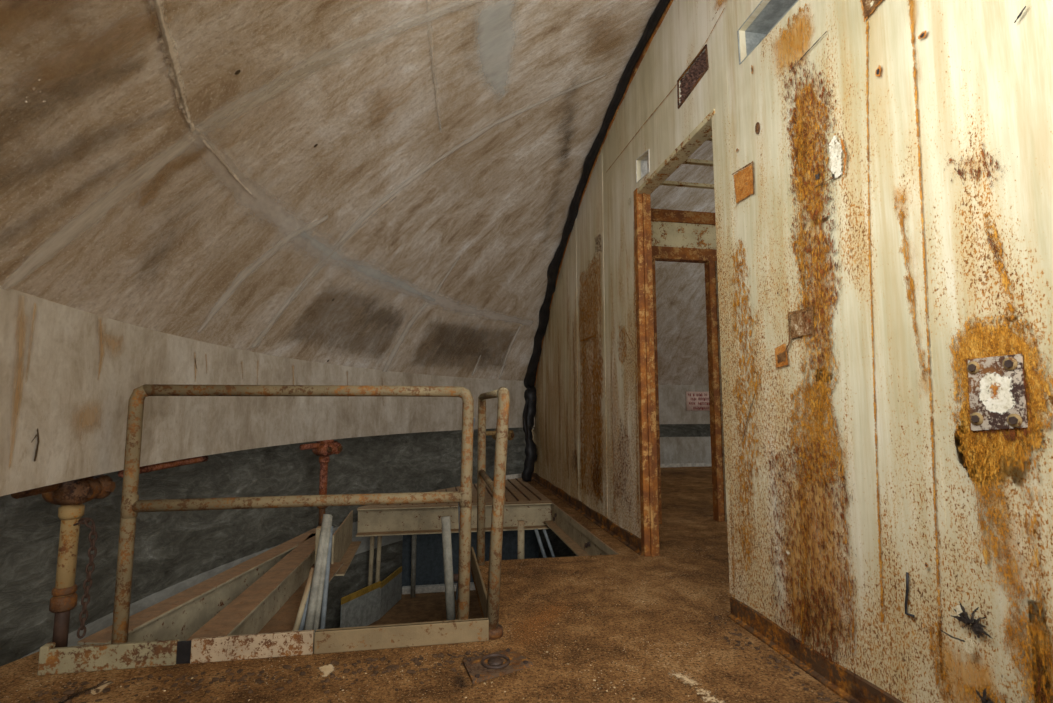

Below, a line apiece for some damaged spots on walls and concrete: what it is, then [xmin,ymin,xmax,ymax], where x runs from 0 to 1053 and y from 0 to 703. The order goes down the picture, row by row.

water stain [5,0,606,378]
corrosion [545,222,639,522]
corrosion [729,4,857,666]
corrosion [866,20,884,622]
corrosion [894,0,1010,703]
corrosion [945,214,1053,703]